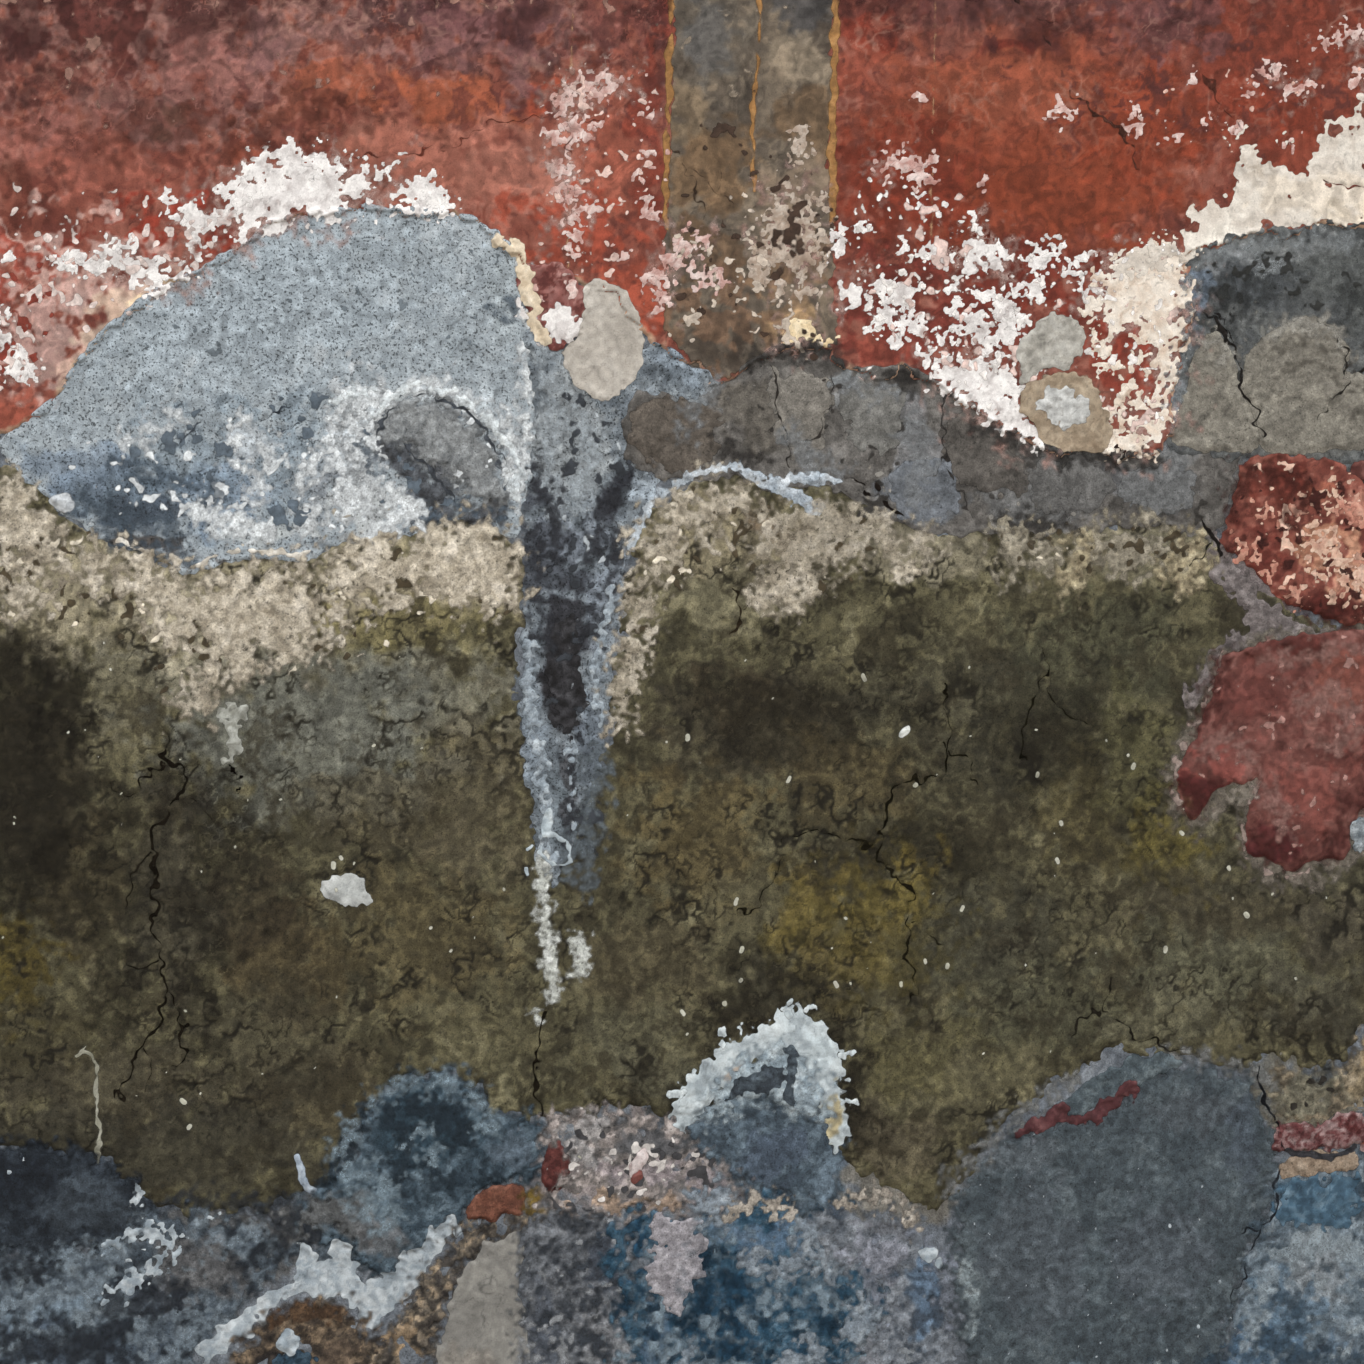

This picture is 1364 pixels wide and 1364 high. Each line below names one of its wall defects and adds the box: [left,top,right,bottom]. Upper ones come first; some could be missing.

spalling [0,15,1364,907]
crack [1203,312,1267,438]
crack [1317,321,1364,419]
leakage [0,464,540,732]
leakage [596,480,951,747]
crack [111,736,225,1102]
crack [737,683,978,1006]
leakage [666,998,859,1154]
leakage [101,1183,189,1308]
spalling [0,1136,341,1364]
peeling [511,1093,958,1364]
spalling [1199,1144,1364,1364]